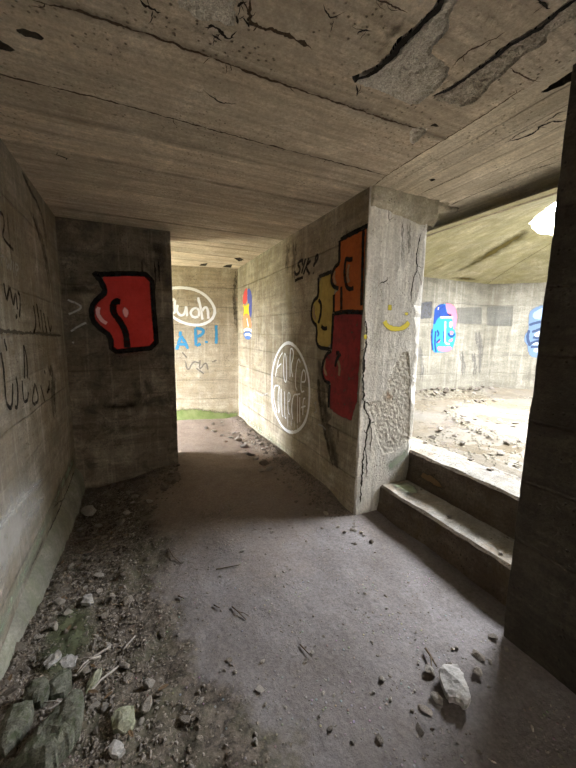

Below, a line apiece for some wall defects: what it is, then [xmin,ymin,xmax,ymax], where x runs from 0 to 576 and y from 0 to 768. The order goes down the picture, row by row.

crack [33,0,420,129]
spalling [350,0,576,107]
crack [454,32,505,65]
crack [0,68,540,185]
crack [508,111,565,142]
crack [359,321,374,502]
spalling [366,351,411,455]